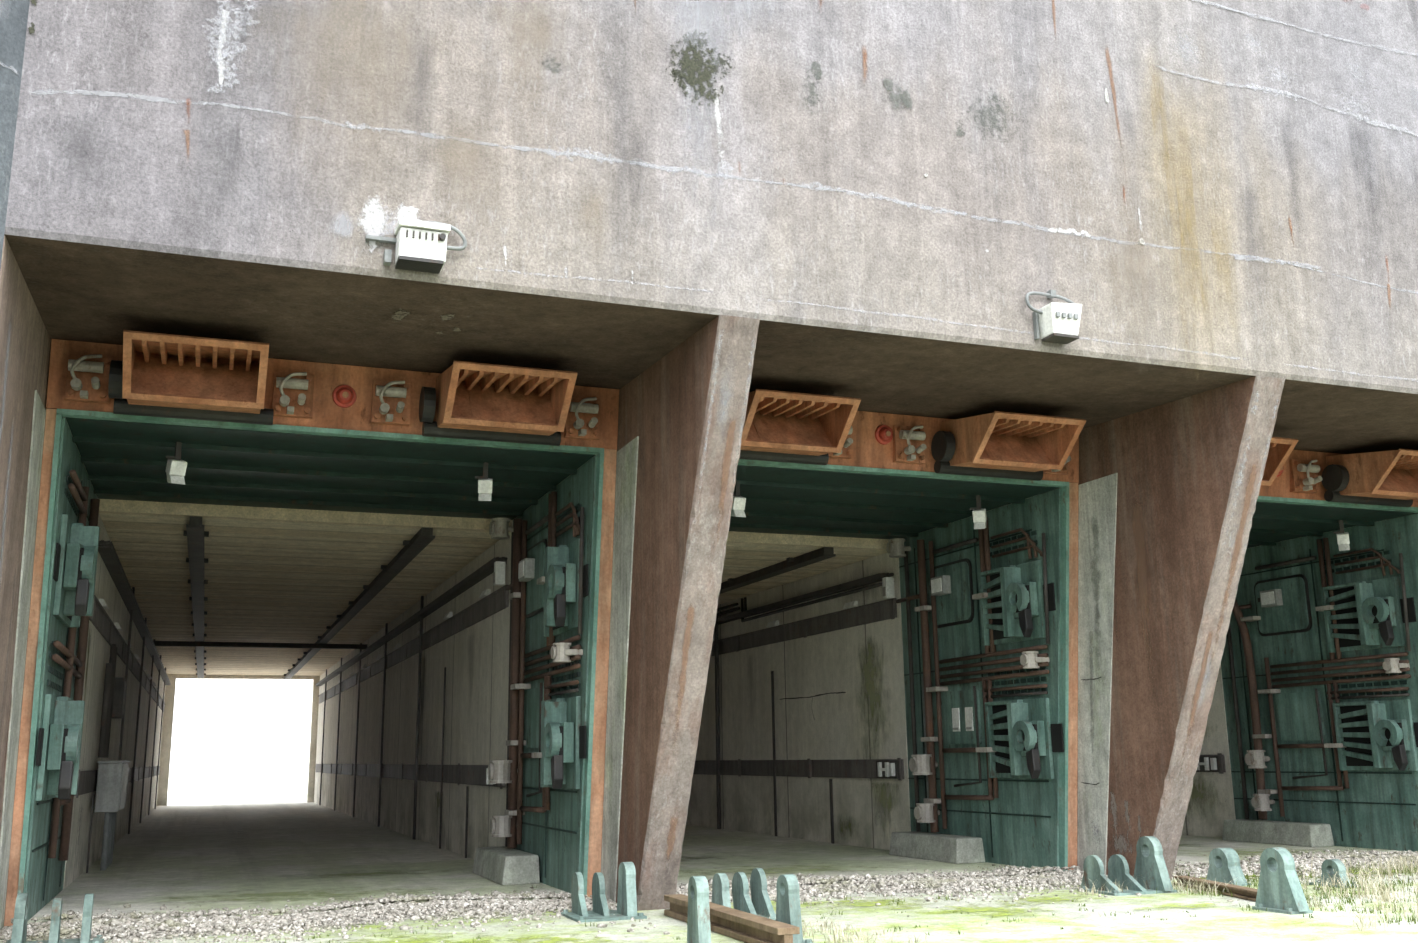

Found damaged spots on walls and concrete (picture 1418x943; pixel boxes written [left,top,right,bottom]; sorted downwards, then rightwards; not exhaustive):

crack [1192,0,1417,56]
water stain [714,88,724,157]
crack [32,10,1418,294]
rust [1106,50,1119,133]
water stain [335,199,420,252]